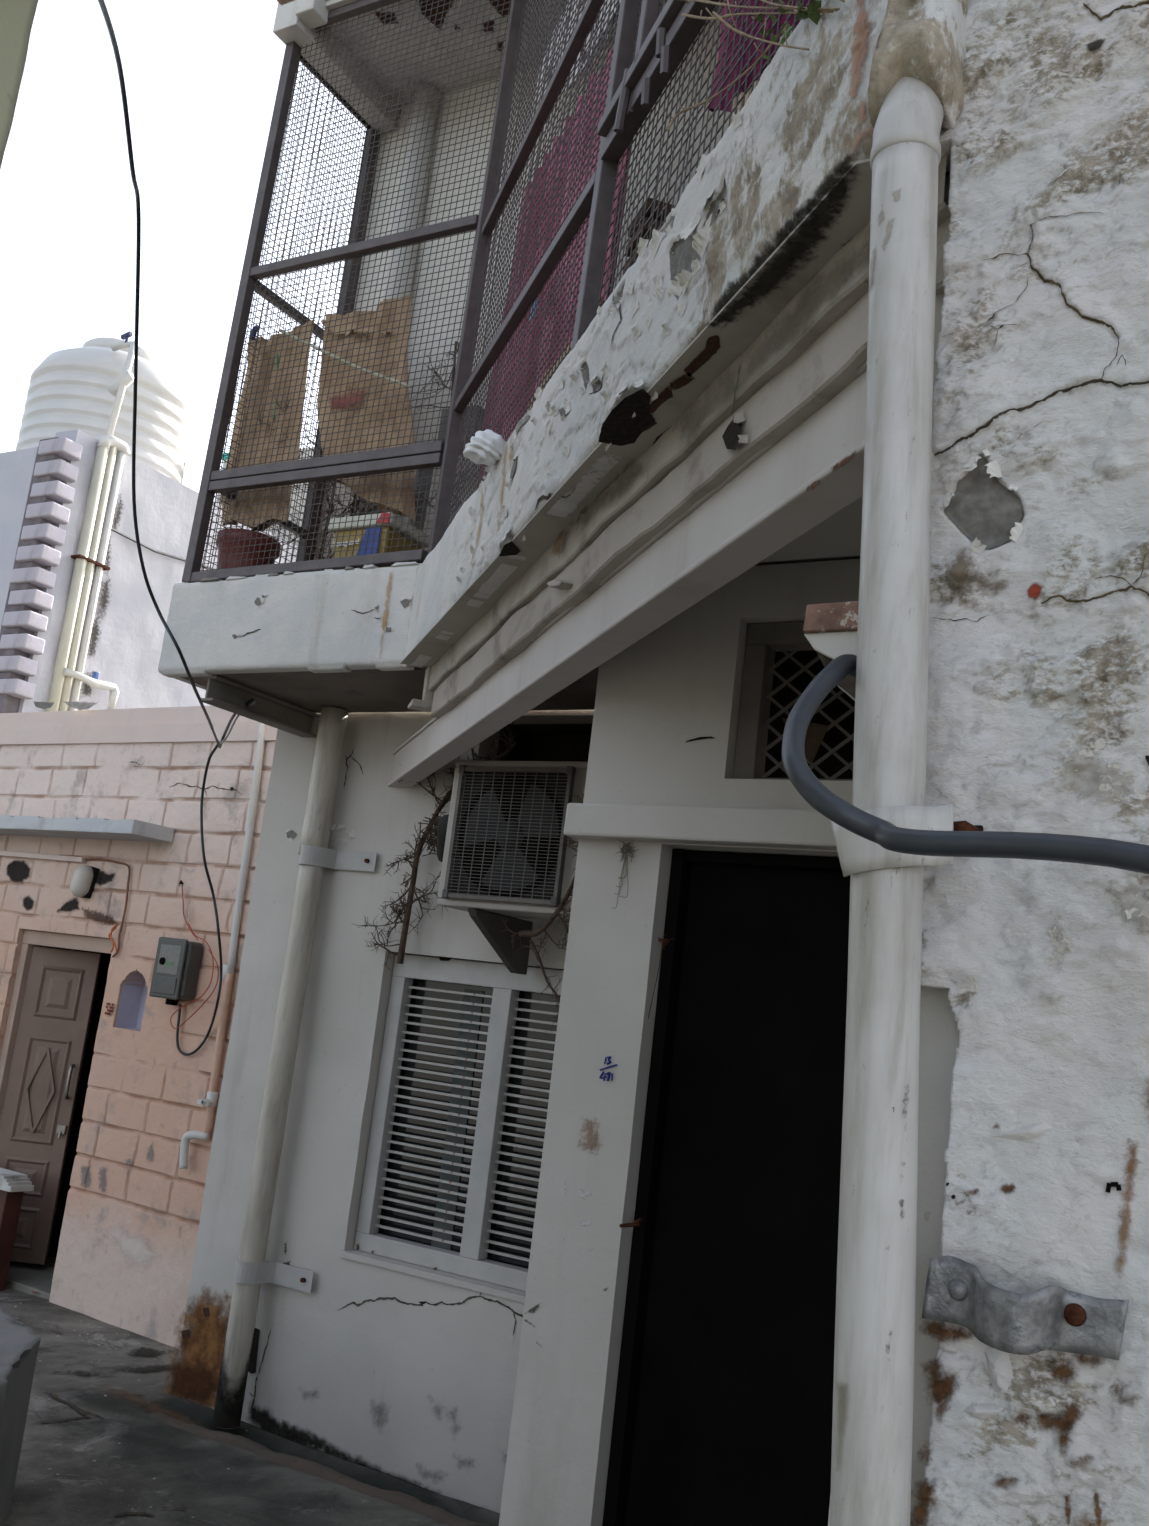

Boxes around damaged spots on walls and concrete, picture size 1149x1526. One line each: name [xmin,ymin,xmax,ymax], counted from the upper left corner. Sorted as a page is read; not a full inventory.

crack [1083,0,1149,21]
spalling [597,154,727,340]
damp [707,156,856,327]
crack [934,212,1149,456]
spalling [722,410,748,450]
spalling [940,449,1024,555]
crack [337,1293,523,1335]
damp [212,1342,427,1490]
rust [923,1320,973,1416]
rust [1017,1405,1091,1466]
rust [1050,1354,1103,1382]
rust [910,1481,934,1526]